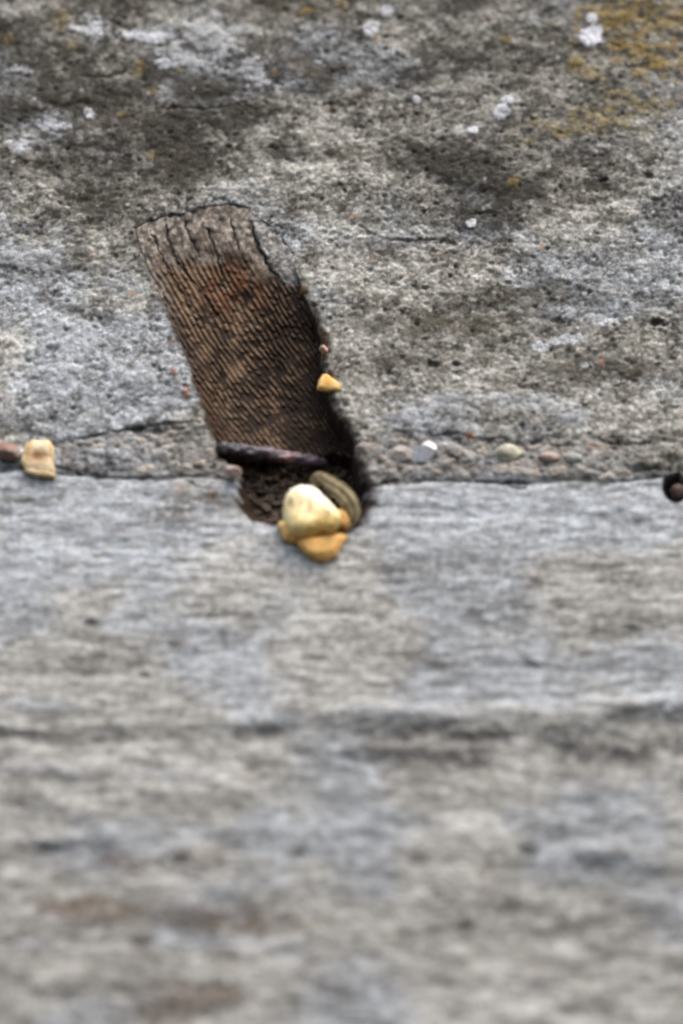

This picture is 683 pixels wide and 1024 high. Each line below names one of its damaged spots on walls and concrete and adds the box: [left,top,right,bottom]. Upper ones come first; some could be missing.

spalling [61,429,215,474]